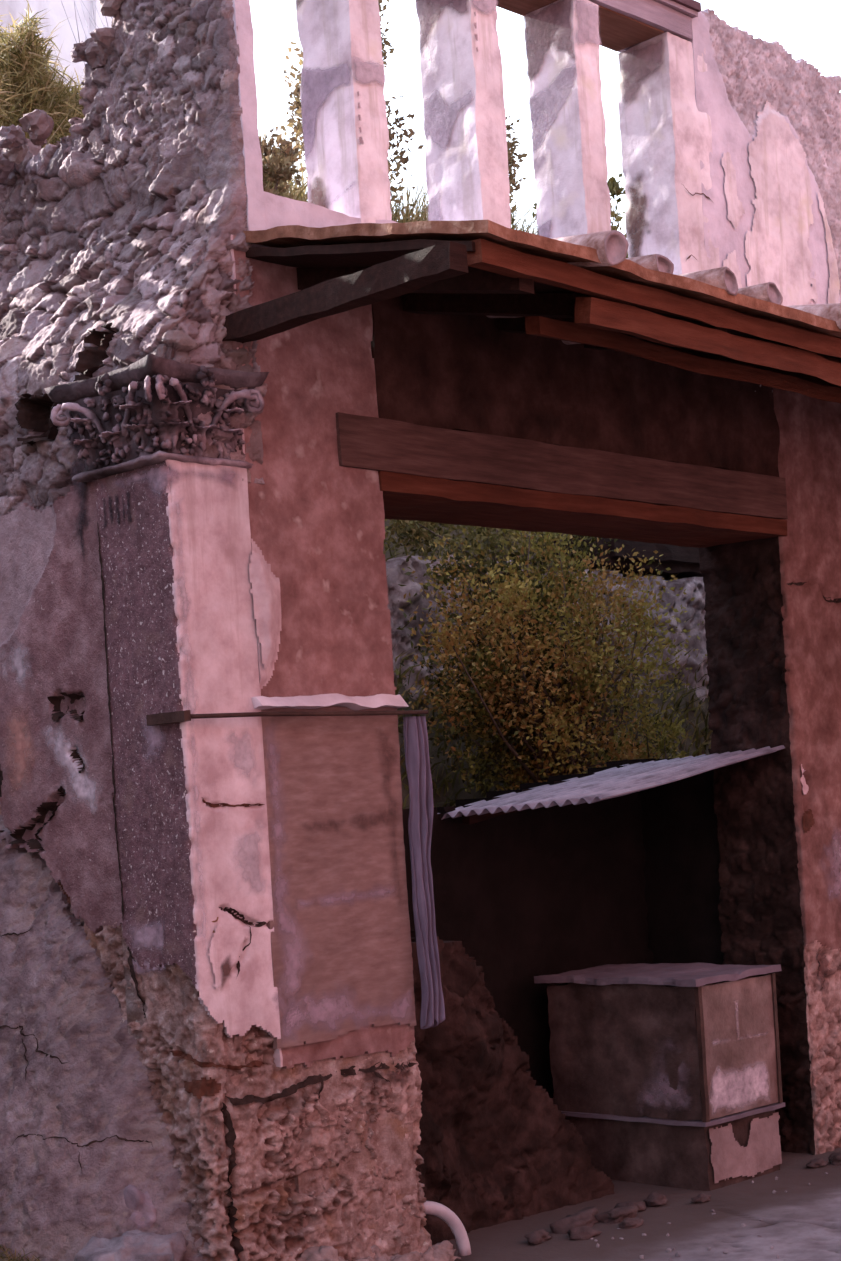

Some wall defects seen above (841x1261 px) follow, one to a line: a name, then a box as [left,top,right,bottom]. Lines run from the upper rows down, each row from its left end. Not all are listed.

flaking render [47,692,85,722]
flaking render [0,786,66,851]
flaking render [133,922,165,973]
crack [208,907,267,989]
flaking render [817,953,832,991]
crack [0,1025,70,1081]
spalling [184,1077,221,1099]
spalling [279,1070,426,1240]